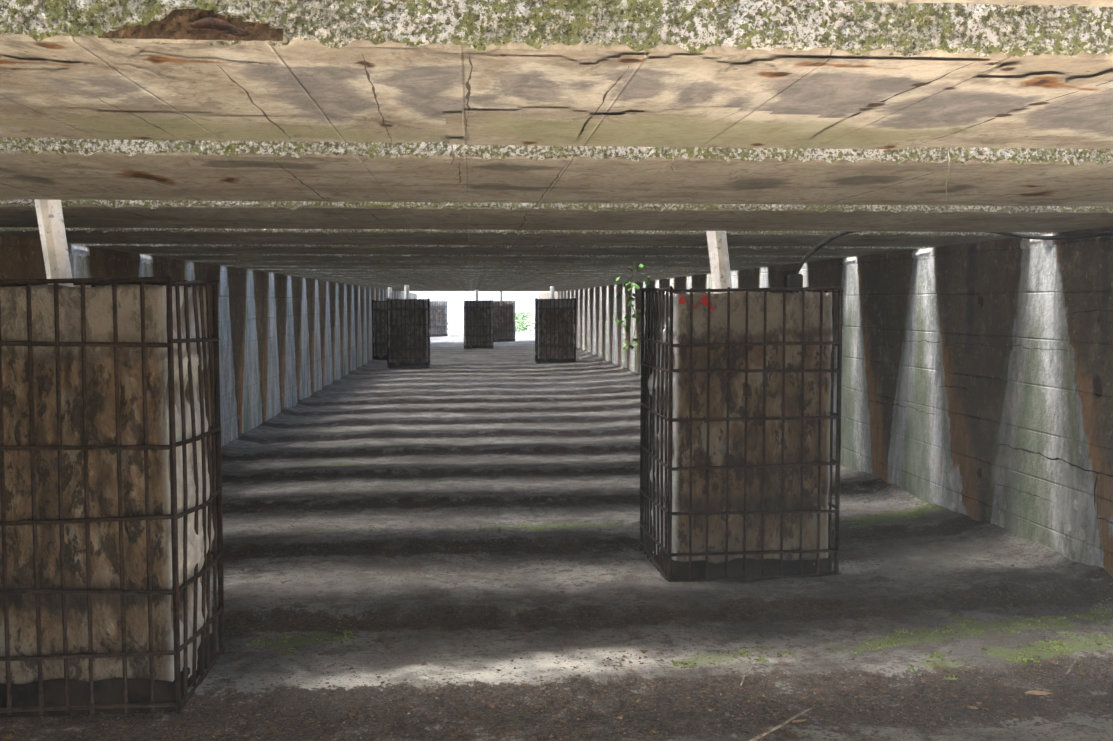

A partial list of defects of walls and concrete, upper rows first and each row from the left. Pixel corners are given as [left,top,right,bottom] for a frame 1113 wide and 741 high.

spalling [98,9,283,41]
crack [217,65,291,139]
crack [348,52,398,142]
crack [465,54,473,135]
damp [0,45,1113,144]
crack [574,67,629,142]
rust [859,256,901,488]
rust [936,248,992,524]
crack [994,444,1113,555]